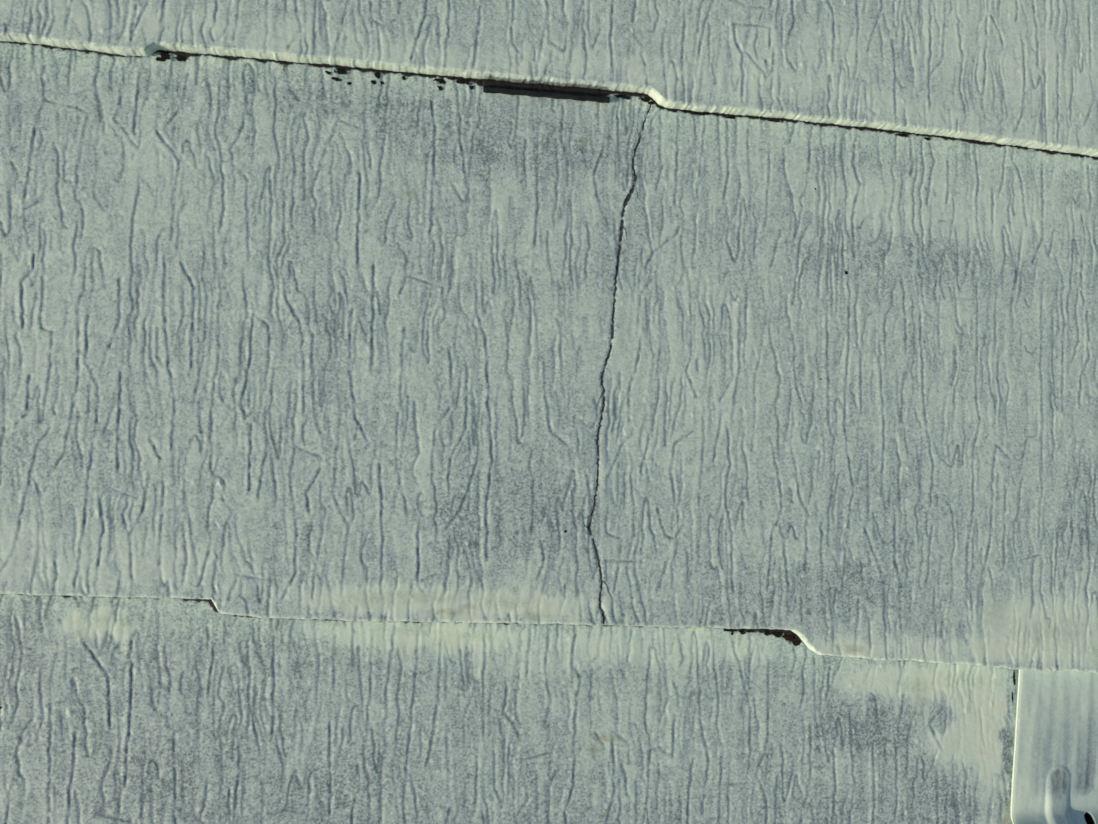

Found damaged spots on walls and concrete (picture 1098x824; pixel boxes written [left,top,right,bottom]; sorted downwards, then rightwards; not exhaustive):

crack [584,105,652,624]